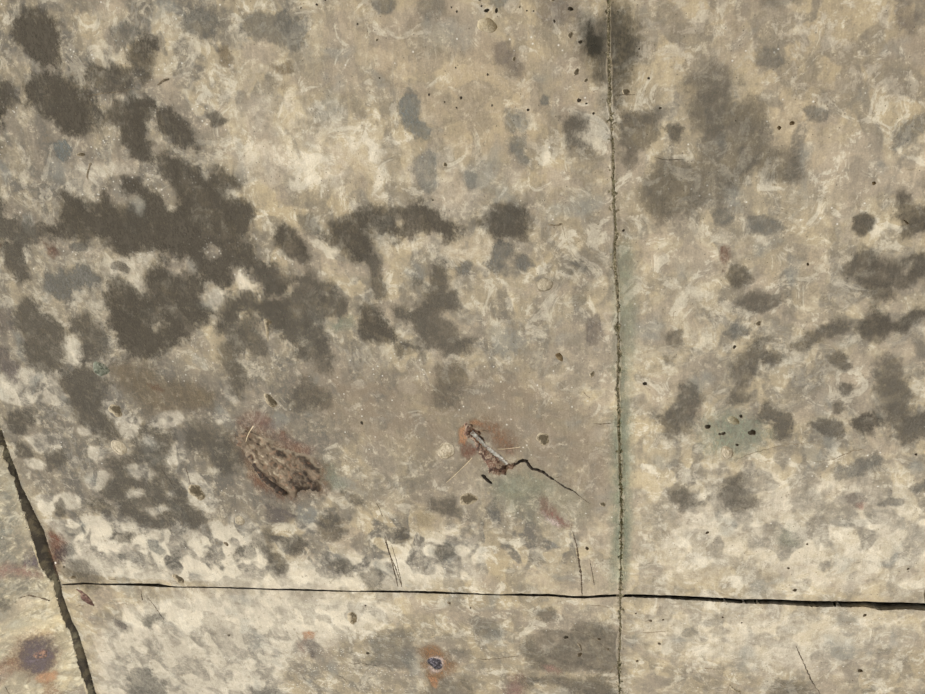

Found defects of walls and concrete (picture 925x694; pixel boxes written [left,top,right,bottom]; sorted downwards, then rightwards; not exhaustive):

damp [0,7,347,439]
damp [321,200,459,297]
damp [358,264,470,356]
damp [853,213,875,236]
damp [848,250,925,301]
damp [859,310,925,337]
damp [810,359,925,445]
damp [91,426,204,528]
spalling [236,426,325,498]
crack [514,459,590,504]
rust [0,638,54,677]
rust [422,646,452,684]